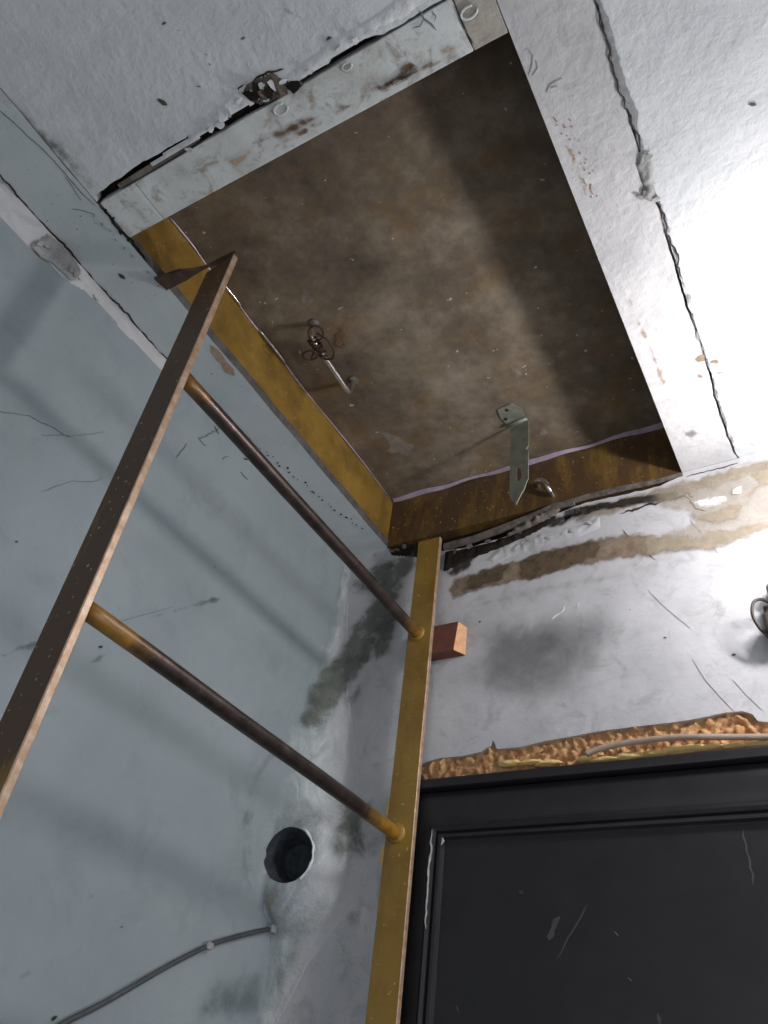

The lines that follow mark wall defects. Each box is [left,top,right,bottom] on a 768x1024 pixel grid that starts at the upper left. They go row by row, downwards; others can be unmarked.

crack [238,69,283,90]
peeling [150,0,428,166]
rust [273,118,314,137]
crack [595,0,644,169]
crack [620,201,737,553]
peeling [453,508,600,563]
leakage [449,505,768,598]
leakage [547,461,768,527]
leakage [304,553,413,725]